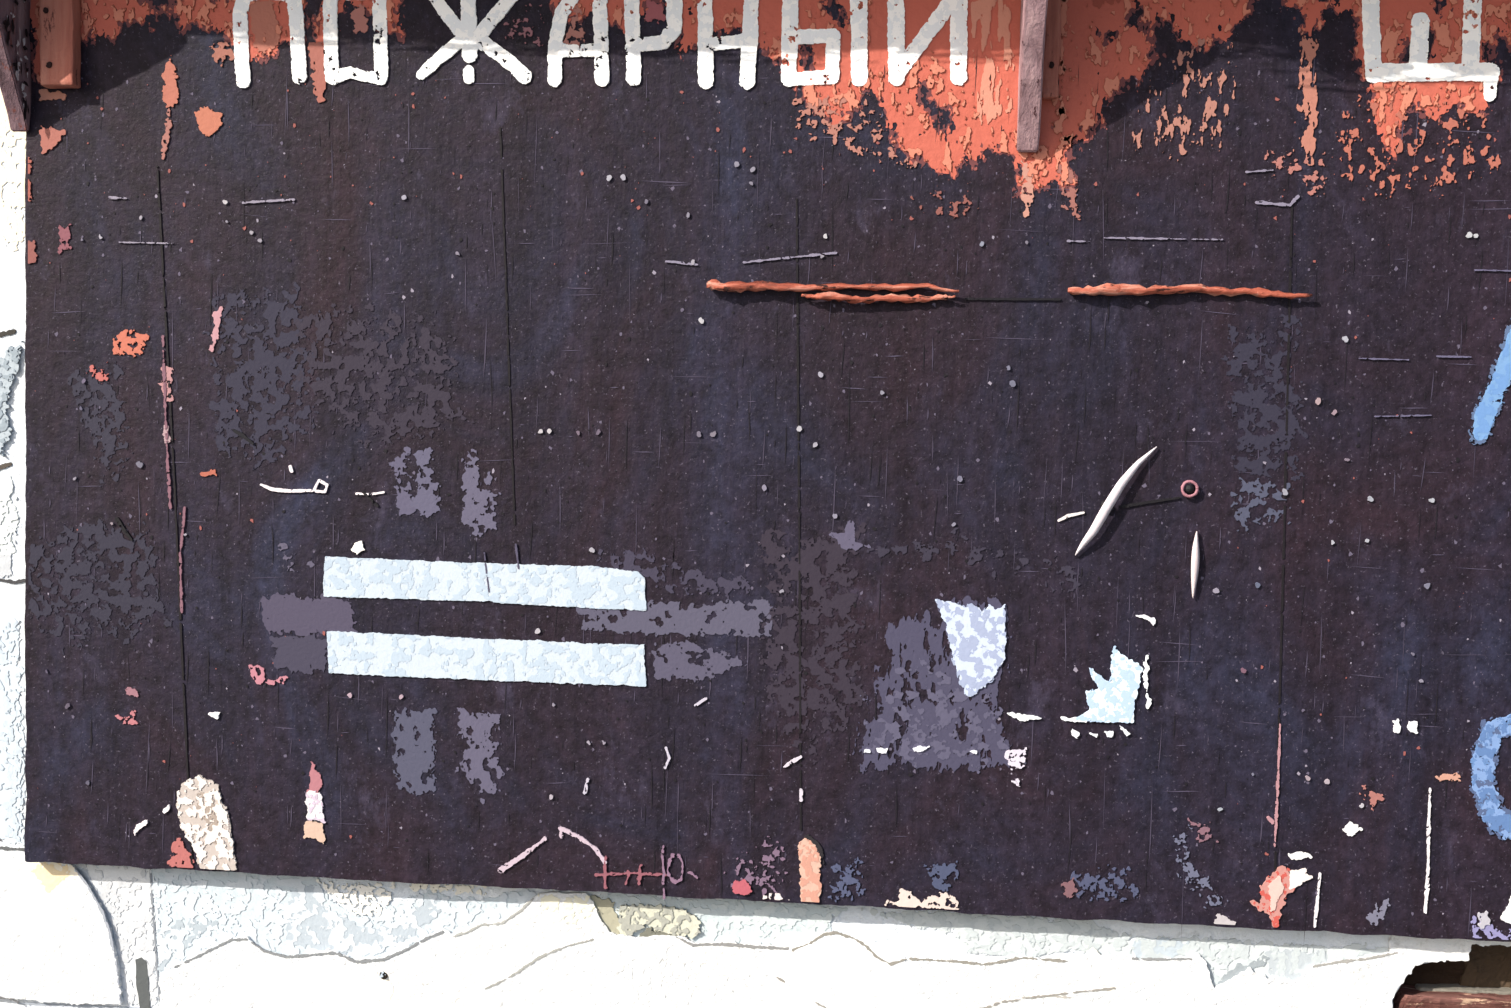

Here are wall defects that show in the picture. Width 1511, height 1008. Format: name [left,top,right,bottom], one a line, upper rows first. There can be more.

flaking render [0,0,67,264]
peeling [161,55,179,160]
peeling [194,106,223,137]
peeling [80,0,406,103]
peeling [503,0,1259,220]
peeling [1264,0,1511,199]
peeling [67,329,150,487]
peeling [158,366,174,407]
peeling [202,282,476,476]
peeling [0,474,173,845]
peeling [248,665,288,685]
peeling [303,761,327,846]